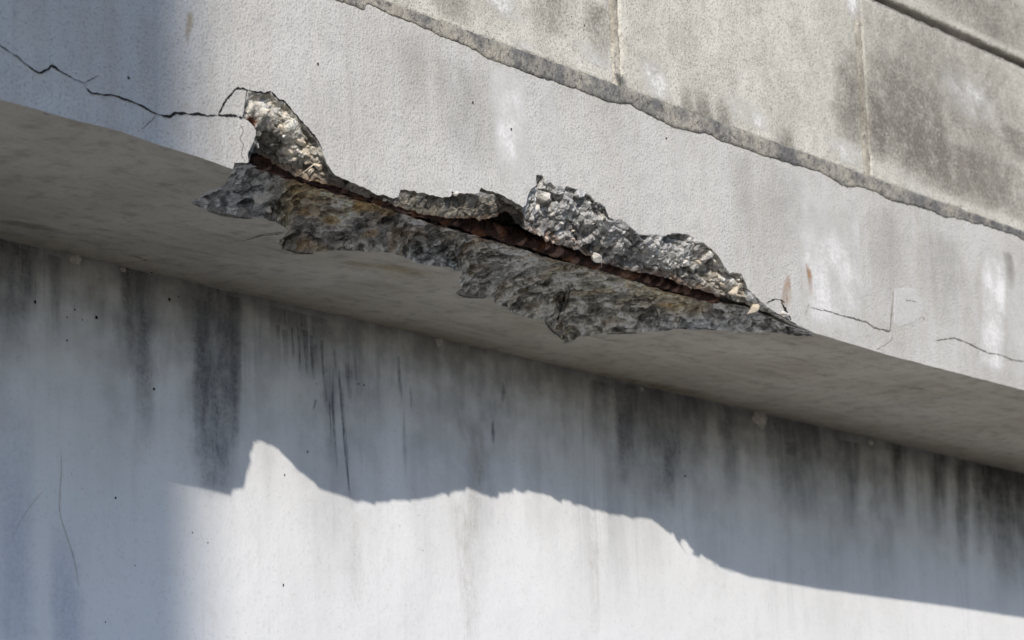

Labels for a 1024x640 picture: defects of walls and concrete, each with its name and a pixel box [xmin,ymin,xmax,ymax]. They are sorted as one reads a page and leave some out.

crack [0,45,323,159]
spalling [191,91,814,343]
efflorescence [799,222,863,332]
crack [766,299,925,350]
crack [940,337,1022,362]
leakage [980,255,1024,371]